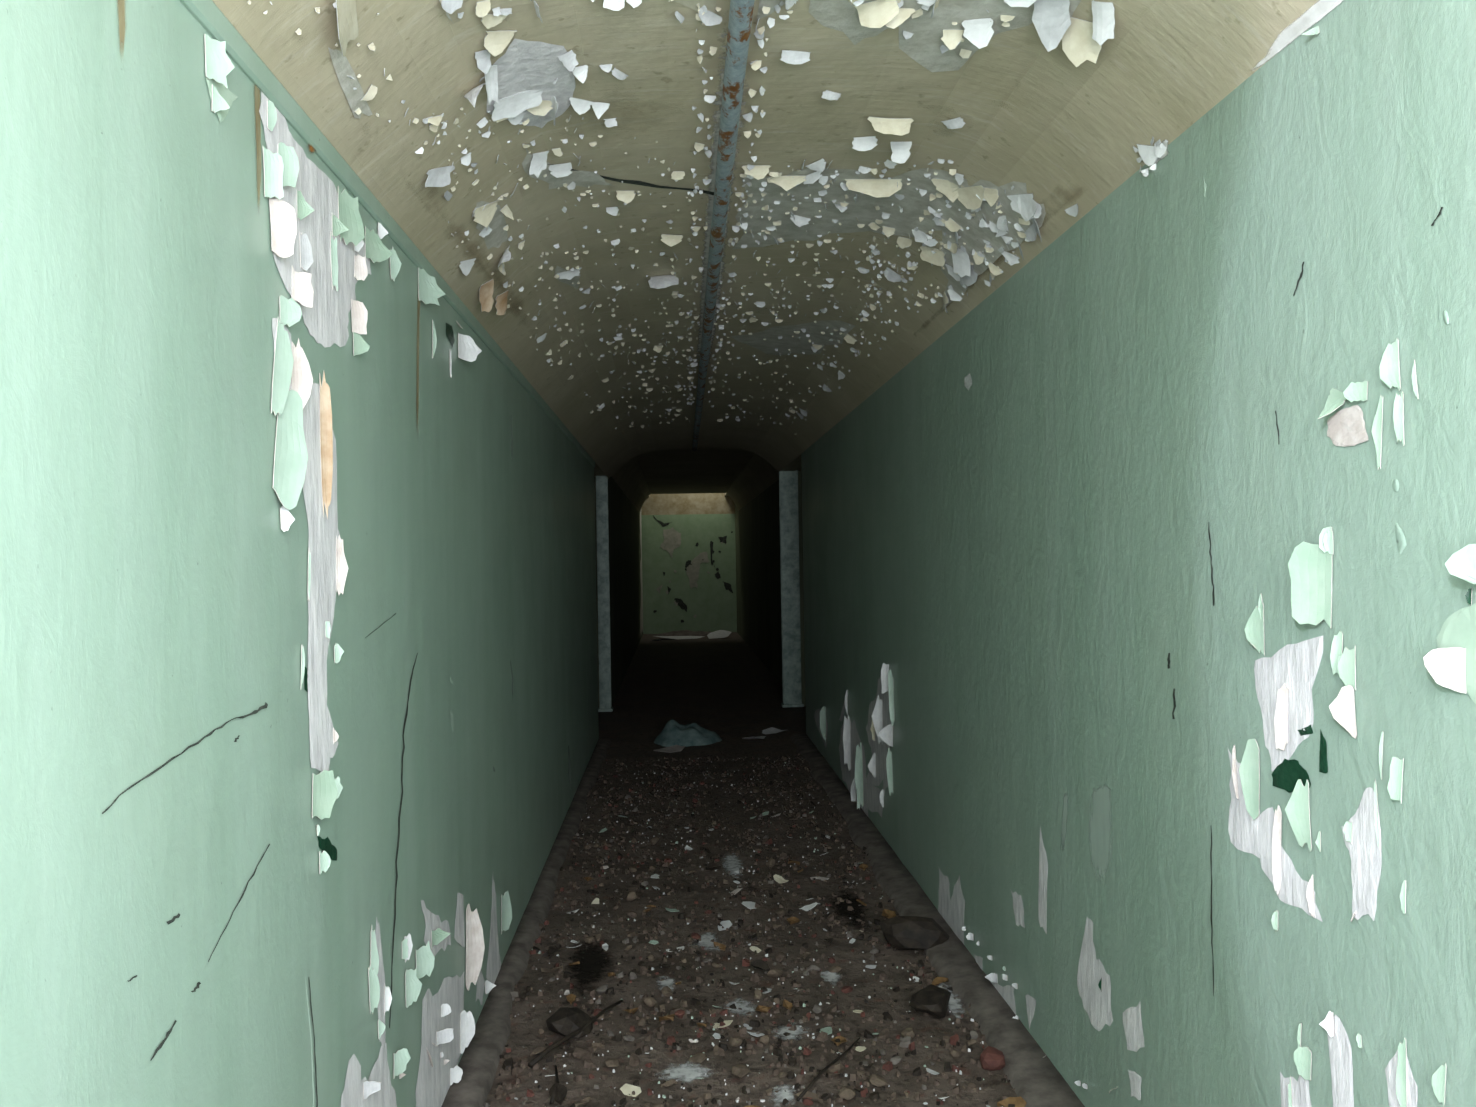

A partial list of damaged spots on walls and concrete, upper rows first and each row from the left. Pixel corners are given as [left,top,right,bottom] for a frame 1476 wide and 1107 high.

peeling [204,34,238,123]
peeling [314,0,1115,435]
peeling [259,91,482,874]
peeling [1318,338,1419,469]
peeling [1423,544,1476,704]
crack [102,703,268,814]
peeling [814,663,895,817]
peeling [1228,527,1357,931]
peeling [1341,731,1404,922]
peeling [341,877,512,1107]
peeling [1280,1011,1362,1107]
peeling [1385,1038,1447,1107]